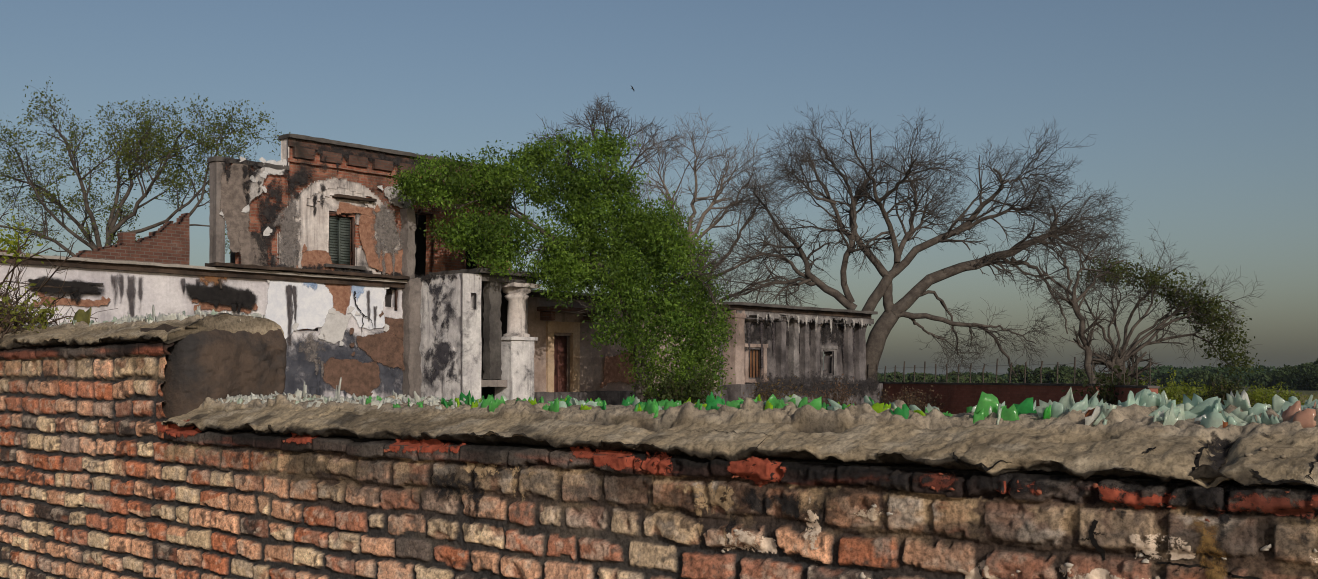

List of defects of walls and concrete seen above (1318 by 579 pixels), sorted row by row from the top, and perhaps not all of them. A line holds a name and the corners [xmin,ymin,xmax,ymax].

flaking render [337,202,414,279]
leakage [103,259,155,317]
leakage [271,263,382,334]
leakage [284,284,403,398]
flaking render [296,244,405,397]
leakage [391,272,457,386]
crack [1192,441,1214,477]
peeling [1059,563,1125,579]
peeling [1129,533,1196,579]